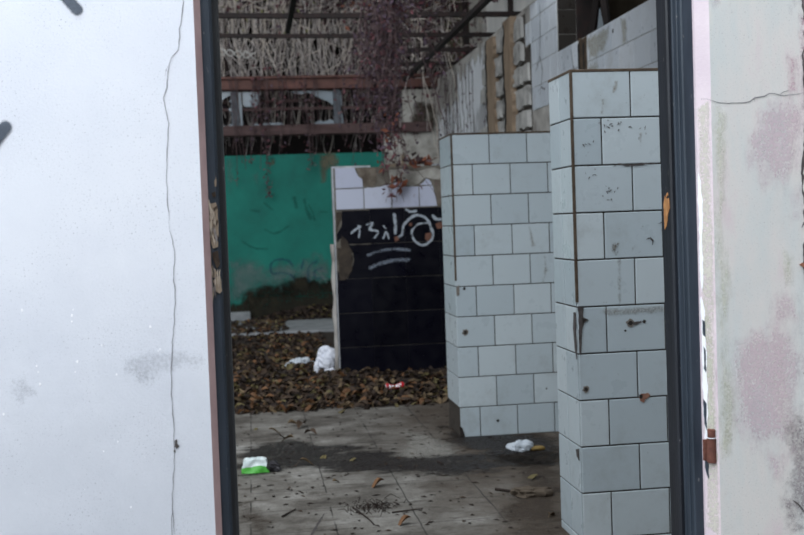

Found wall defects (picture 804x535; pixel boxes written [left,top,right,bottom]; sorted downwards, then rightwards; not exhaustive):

crack [708,0,804,104]
crack [163,0,184,534]
peeling [208,176,222,299]
spalling [335,212,353,281]
spalling [356,167,377,187]
spalling [389,164,442,205]
crack [796,143,804,270]